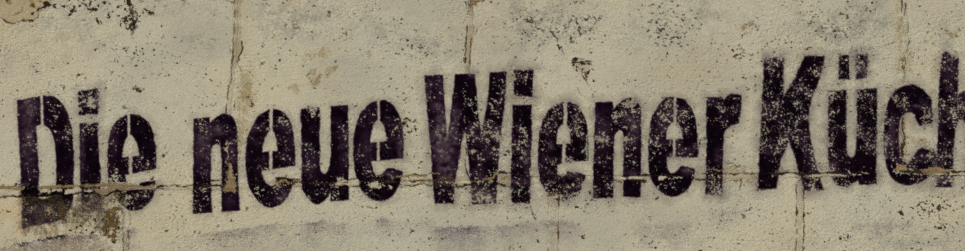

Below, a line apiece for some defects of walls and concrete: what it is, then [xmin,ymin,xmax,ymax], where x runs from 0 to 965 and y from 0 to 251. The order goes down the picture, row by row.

peeling [0,0,126,24]
crack [225,0,253,113]
leakage [26,193,104,239]
crack [156,180,222,189]
crack [271,148,532,190]
crack [555,173,670,205]
crack [693,164,849,248]